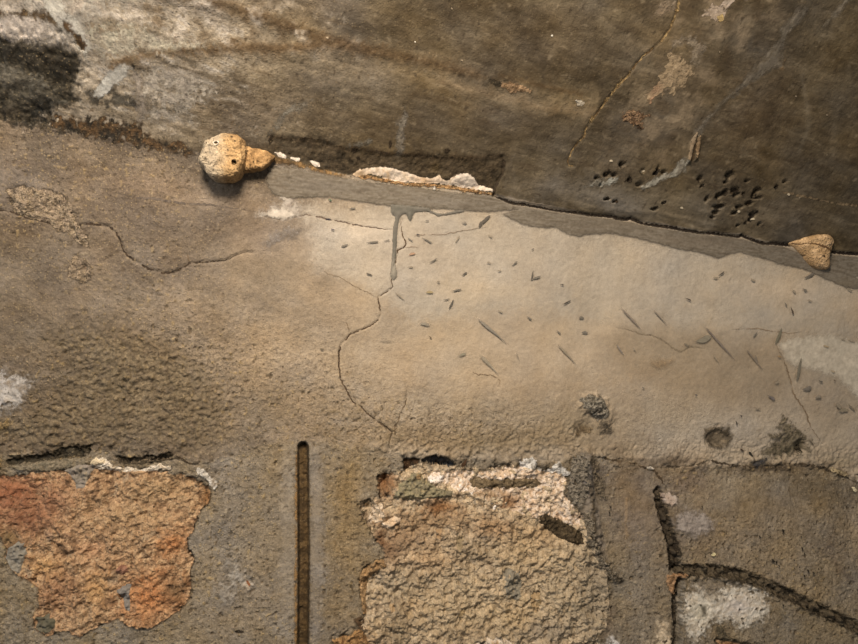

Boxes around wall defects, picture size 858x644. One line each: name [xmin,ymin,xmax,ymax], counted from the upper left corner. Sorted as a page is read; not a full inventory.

damp [0,0,217,158]
crack [567,0,680,166]
crack [77,222,252,274]
damp [268,102,502,188]
peeling [353,166,493,196]
crack [492,158,858,255]
crack [123,194,478,442]
spalling [0,464,210,637]
spalling [332,460,610,644]
damp [475,636,512,644]
damp [655,583,769,644]
spalling [715,626,759,644]